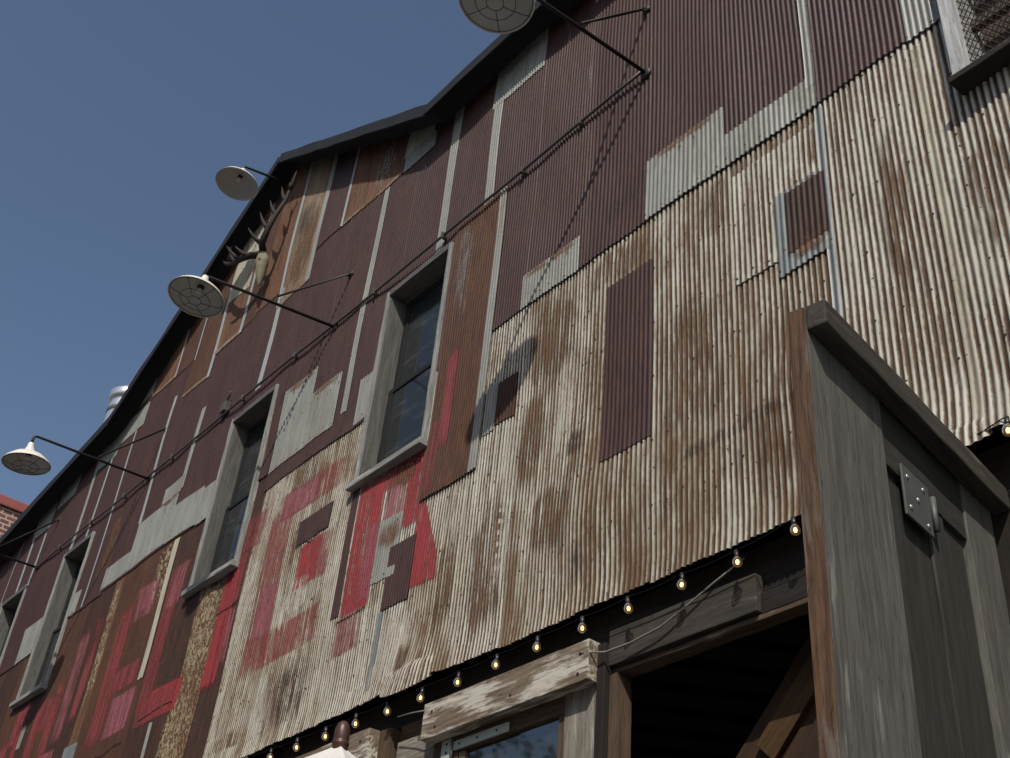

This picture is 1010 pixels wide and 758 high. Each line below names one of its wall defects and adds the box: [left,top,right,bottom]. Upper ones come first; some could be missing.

corrosion [702,178,727,239]
corrosion [879,137,925,288]
corrosion [971,142,1010,204]
corrosion [519,396,543,484]
corrosion [534,301,570,385]
corrosion [568,433,581,452]
corrosion [665,299,718,433]
corrosion [689,317,797,489]
corrosion [532,478,567,548]
corrosion [209,731,239,757]